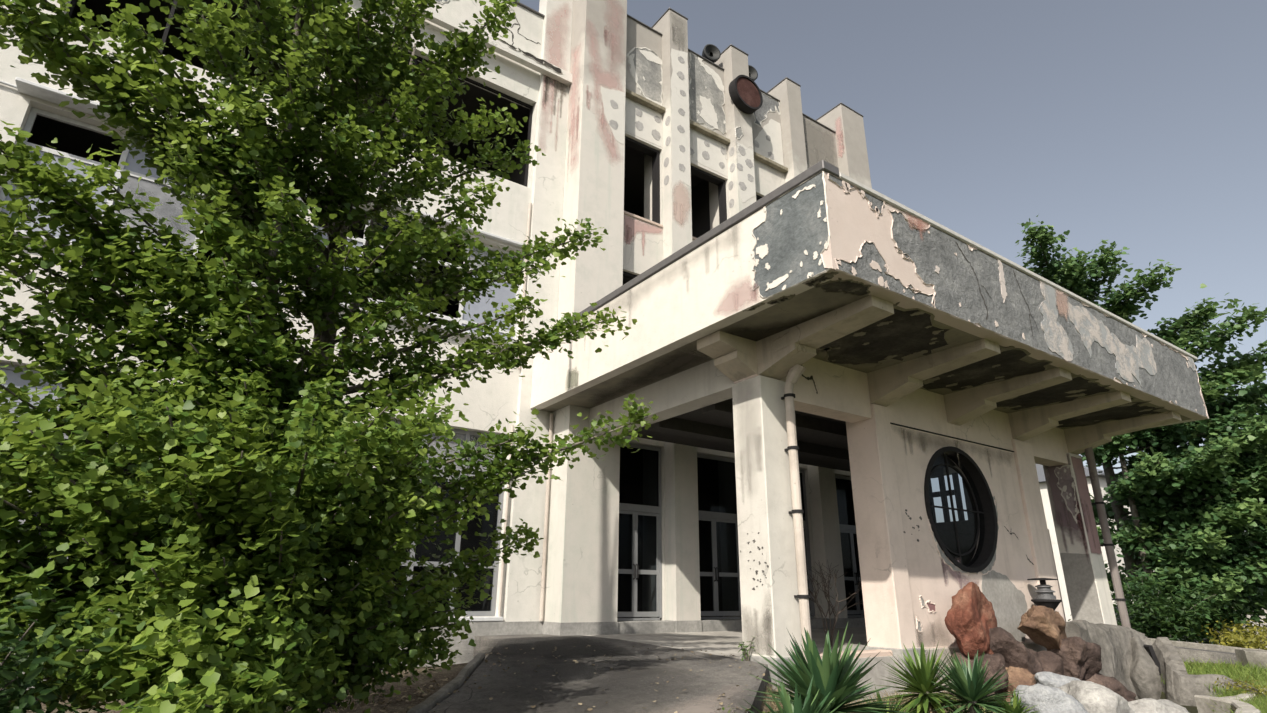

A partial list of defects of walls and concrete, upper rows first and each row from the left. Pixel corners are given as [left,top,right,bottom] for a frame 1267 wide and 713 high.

leakage [674,184,690,223]
leakage [624,216,662,255]
peeling [601,47,1208,428]